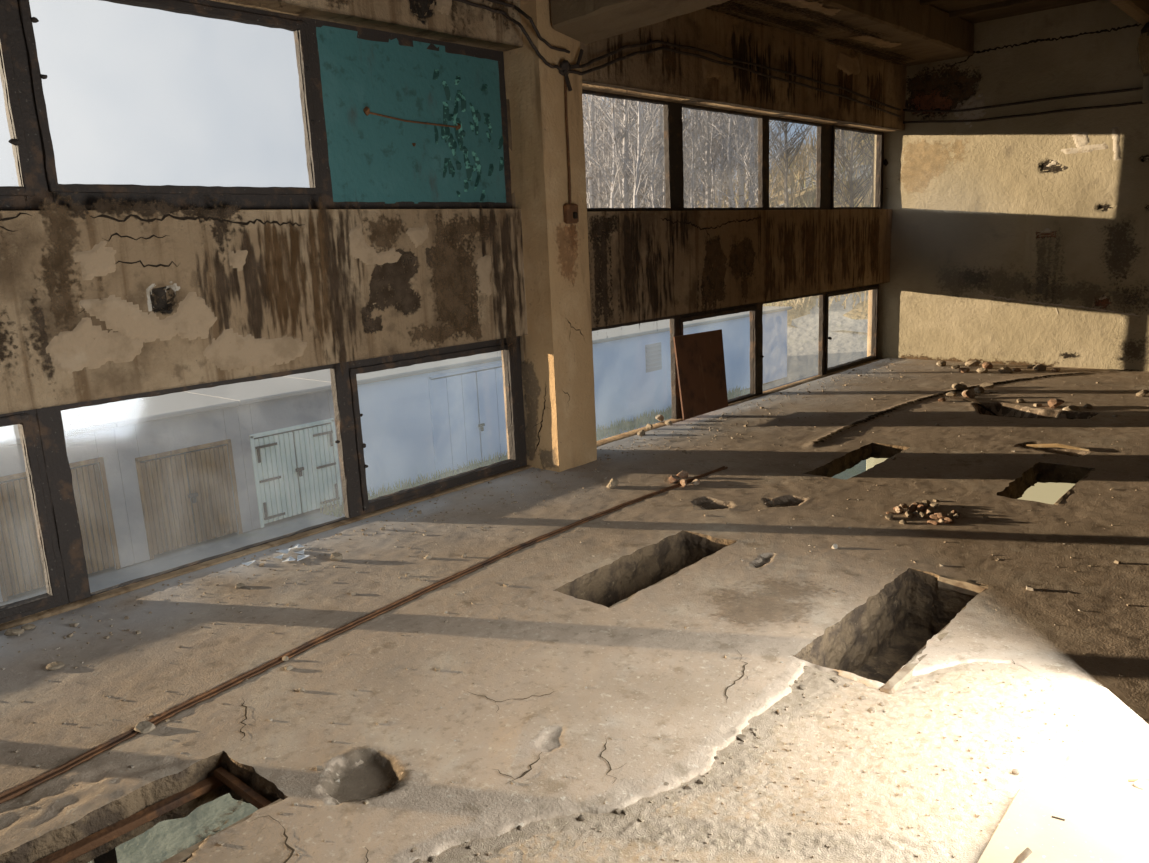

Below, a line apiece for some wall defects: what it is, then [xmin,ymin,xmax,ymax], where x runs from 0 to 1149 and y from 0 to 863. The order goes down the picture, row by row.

peeling [73,241,116,280]
leakage [0,192,360,378]
crack [89,206,301,267]
peeling [228,250,248,271]
leakage [365,214,408,253]
spalling [349,224,439,333]
peeling [477,254,492,297]
leakage [588,212,688,329]
leakage [697,212,880,315]
peeling [46,281,307,375]
leakage [1121,337,1149,360]
crack [256,815,295,863]